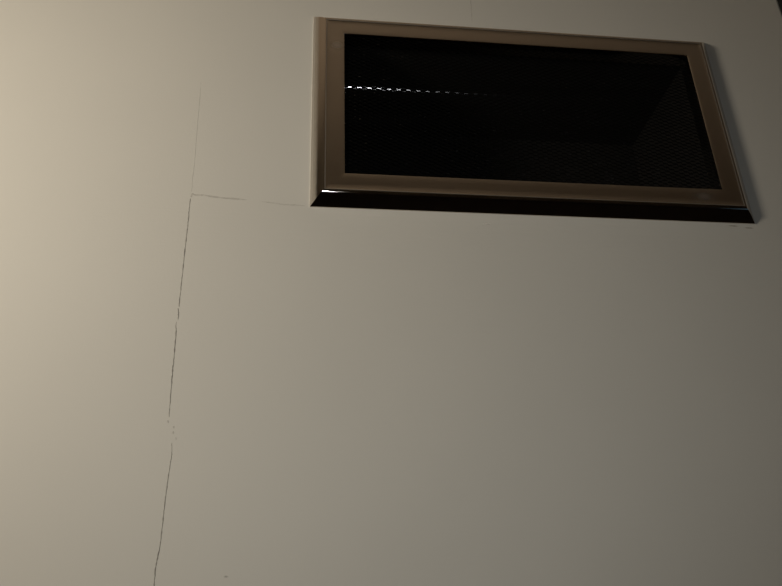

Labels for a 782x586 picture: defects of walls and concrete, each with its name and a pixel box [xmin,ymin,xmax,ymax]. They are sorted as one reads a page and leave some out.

crack [153,84,304,586]